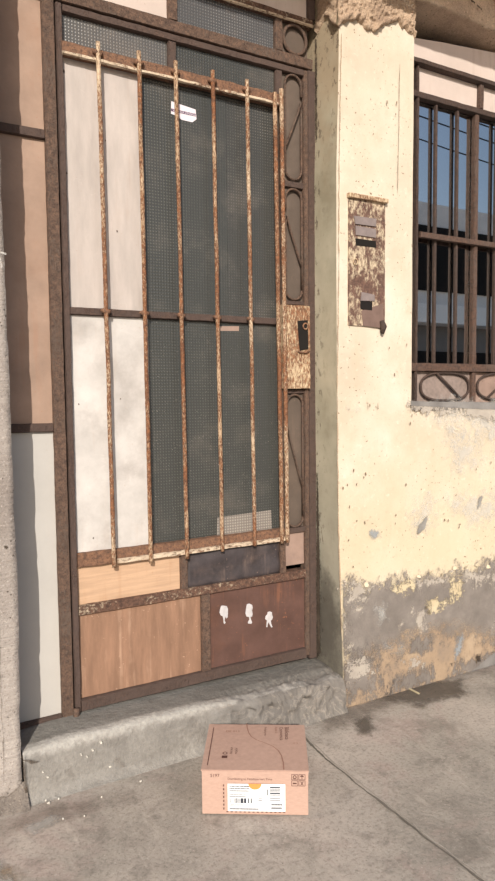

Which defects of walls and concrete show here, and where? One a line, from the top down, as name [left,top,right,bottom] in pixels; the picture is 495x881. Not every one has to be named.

spalling [314,0,417,140]
water stain [356,717,374,733]
peeling [337,557,495,708]
water stain [385,679,465,707]